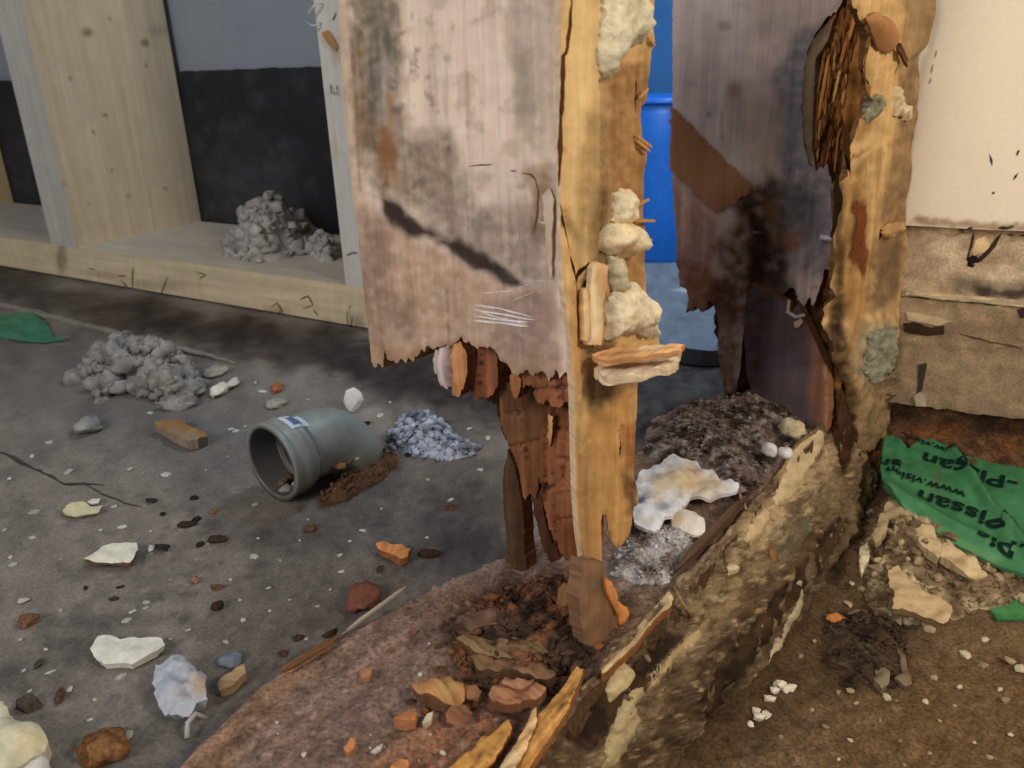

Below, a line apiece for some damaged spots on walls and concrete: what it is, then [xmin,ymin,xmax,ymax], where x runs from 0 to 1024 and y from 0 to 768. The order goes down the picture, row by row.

crack [472,0,589,299]
water stain [669,106,768,283]
water stain [382,199,520,285]
peeling [957,227,990,256]
spalling [903,312,952,336]
spalling [914,363,927,407]
crack [0,452,141,507]